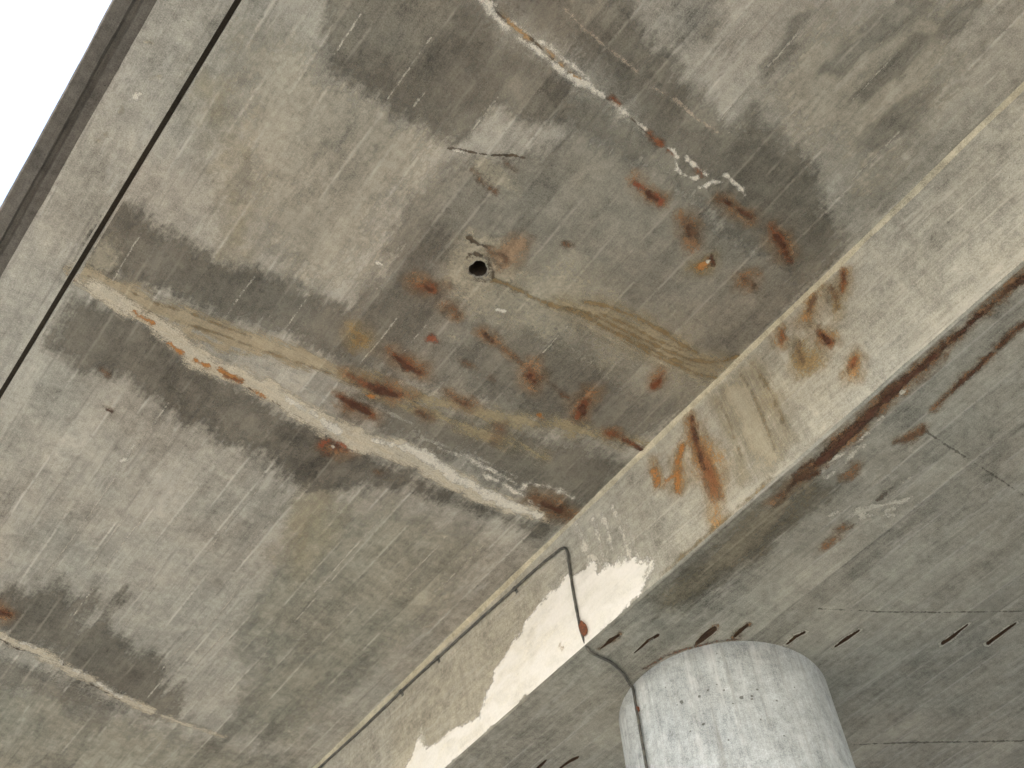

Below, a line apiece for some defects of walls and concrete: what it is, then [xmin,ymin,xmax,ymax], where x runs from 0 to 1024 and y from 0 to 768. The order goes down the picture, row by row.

crack [447,147,526,159]
crack [479,0,745,196]
rust [625,170,717,275]
crack [63,244,649,523]
rust [333,344,435,422]
leakage [45,0,847,610]
rust [649,411,725,529]
rust [774,267,851,378]
rust [841,348,863,382]
rust [894,423,928,444]
leakage [0,578,182,723]
crack [0,632,227,738]